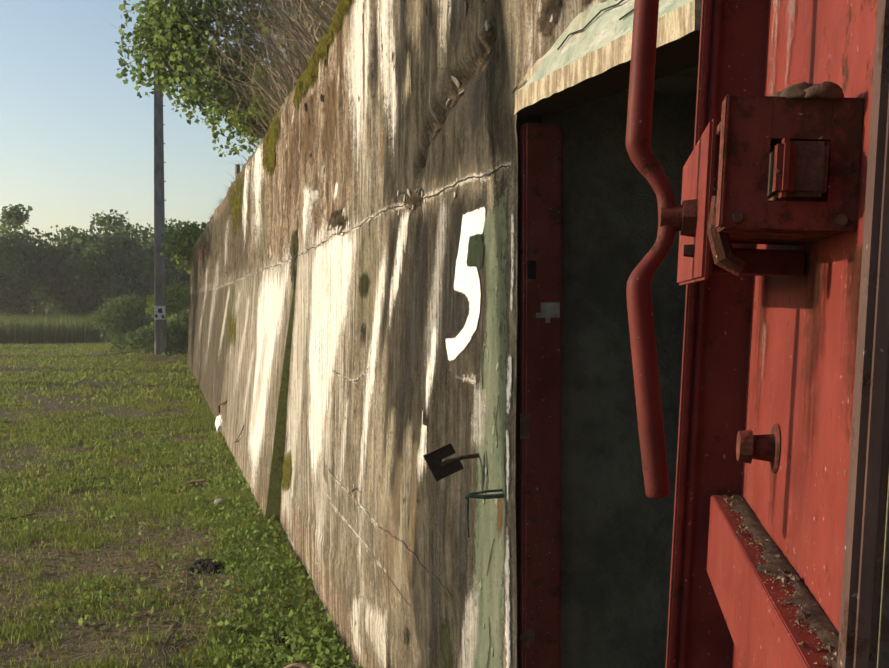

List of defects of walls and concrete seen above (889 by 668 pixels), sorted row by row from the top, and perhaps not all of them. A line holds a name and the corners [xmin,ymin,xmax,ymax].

damp [242,144,264,242]
damp [288,78,336,210]
crack [208,94,511,291]
damp [334,0,472,200]
spalling [431,21,497,140]
damp [199,188,357,553]
damp [358,201,465,612]